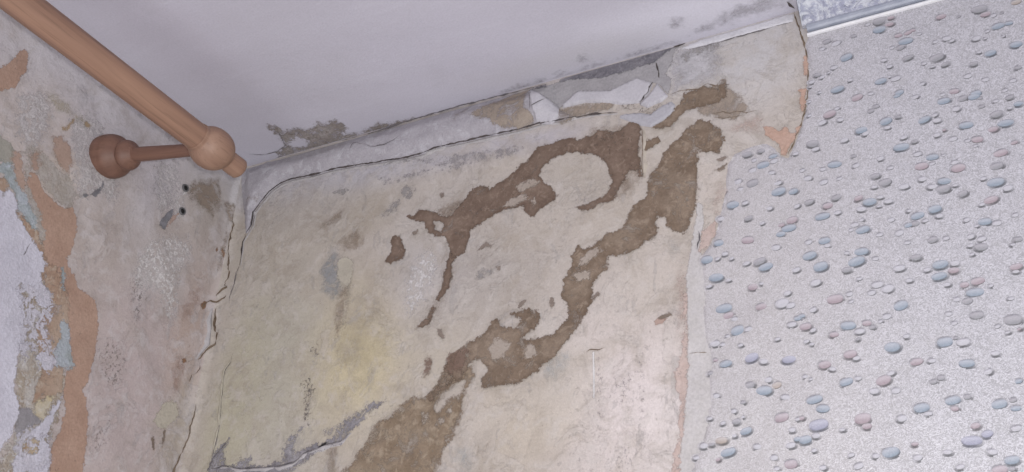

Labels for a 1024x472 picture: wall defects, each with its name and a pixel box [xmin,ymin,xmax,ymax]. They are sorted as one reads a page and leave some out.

flaking render [0,49,28,92]
flaking render [529,44,725,127]
crack [189,84,618,382]
flaking render [0,136,99,472]
crack [173,406,196,472]
crack [207,432,351,472]